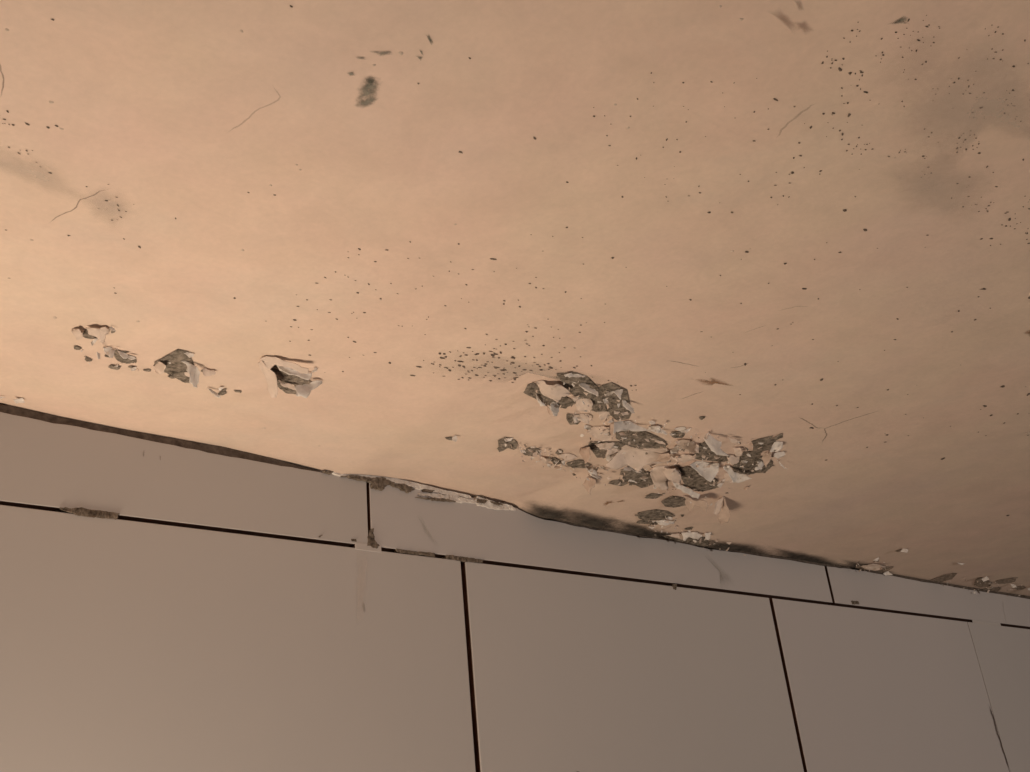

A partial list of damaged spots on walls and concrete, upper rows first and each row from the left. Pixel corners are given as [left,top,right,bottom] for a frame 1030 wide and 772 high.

damp [360,79,376,106]
peeling [71,326,241,398]
peeling [497,372,787,551]
flaking render [930,563,1030,596]